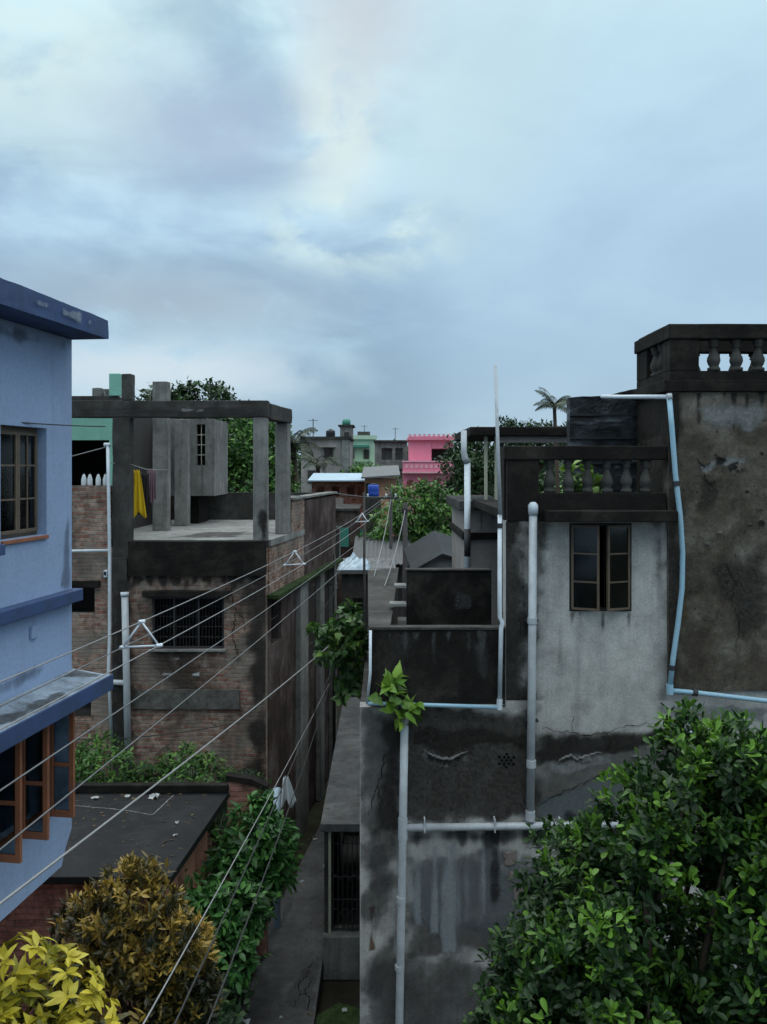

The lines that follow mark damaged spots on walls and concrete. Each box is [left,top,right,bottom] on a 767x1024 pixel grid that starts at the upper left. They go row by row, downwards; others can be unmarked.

spalling [697,452,744,484]
crack [231,589,245,655]
water stain [361,521,698,1024]
crack [539,718,654,806]